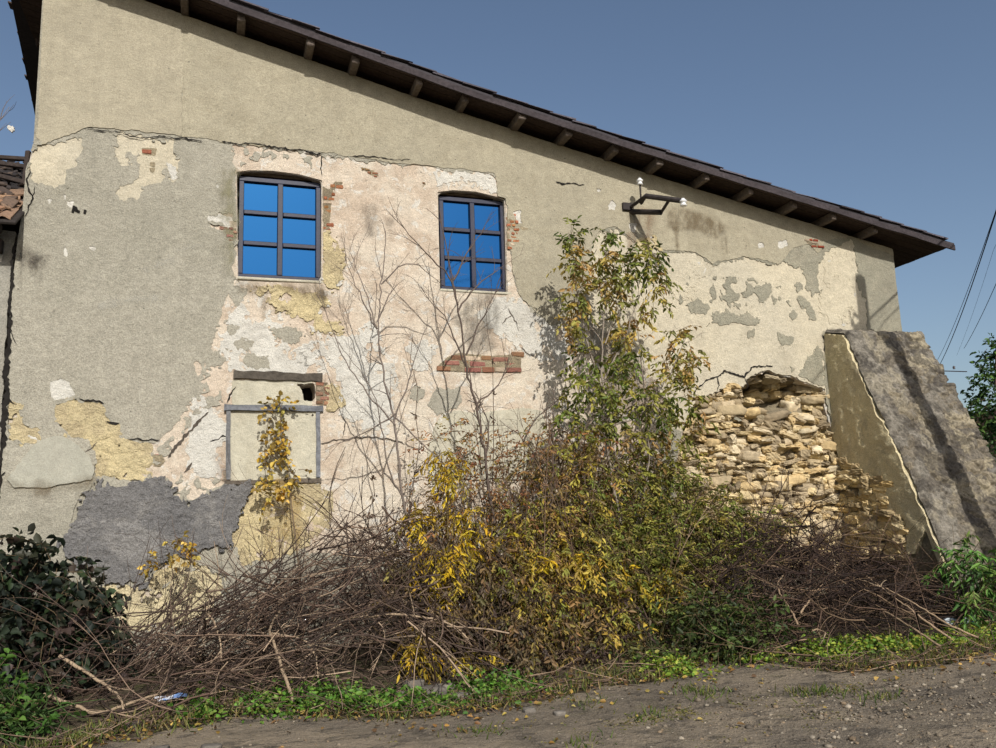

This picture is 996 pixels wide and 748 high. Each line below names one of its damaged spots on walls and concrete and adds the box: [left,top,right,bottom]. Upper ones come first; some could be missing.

peeling [0,138,83,213]
peeling [113,131,180,201]
crack [89,127,322,174]
peeling [50,144,867,566]
crack [694,365,772,397]
flaking render [8,401,41,447]
crack [80,387,236,472]